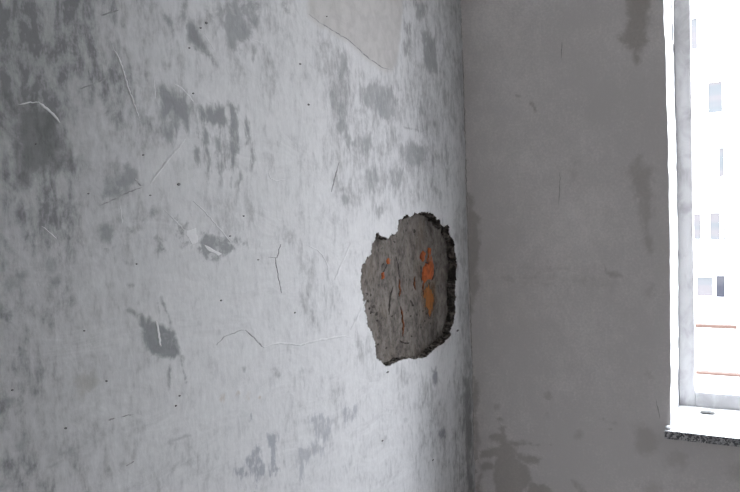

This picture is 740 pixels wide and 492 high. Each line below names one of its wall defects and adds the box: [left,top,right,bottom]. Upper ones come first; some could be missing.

crack [309,14,392,70]
leakage [606,0,664,74]
flaking render [148,0,457,394]
crack [270,244,282,293]
leakage [457,365,598,492]